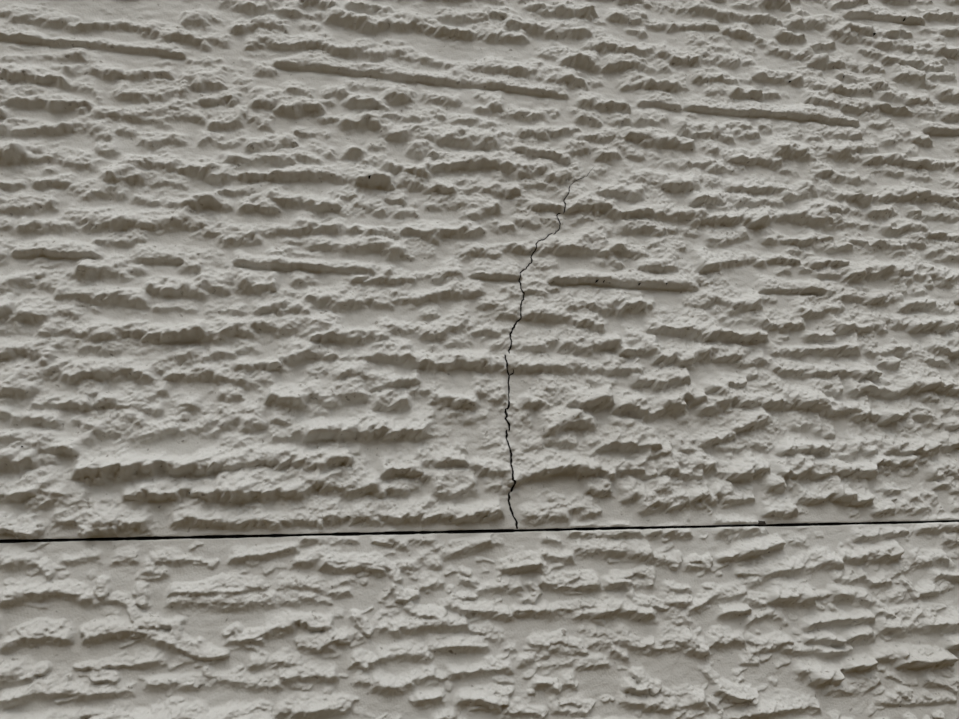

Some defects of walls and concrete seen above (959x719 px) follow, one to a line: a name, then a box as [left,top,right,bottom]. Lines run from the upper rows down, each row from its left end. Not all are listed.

crack [504,167,594,529]